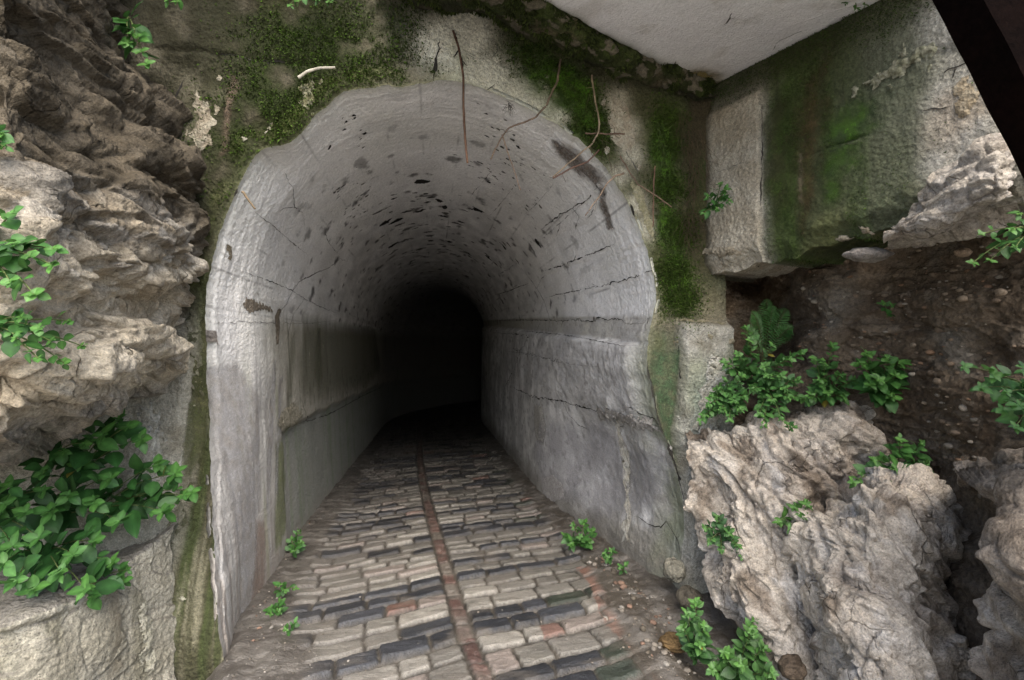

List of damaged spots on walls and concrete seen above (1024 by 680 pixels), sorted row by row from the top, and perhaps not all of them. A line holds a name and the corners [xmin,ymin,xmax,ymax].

peeling [243,295,281,344]
crack [208,175,348,334]
crack [531,187,596,235]
crack [495,244,684,498]